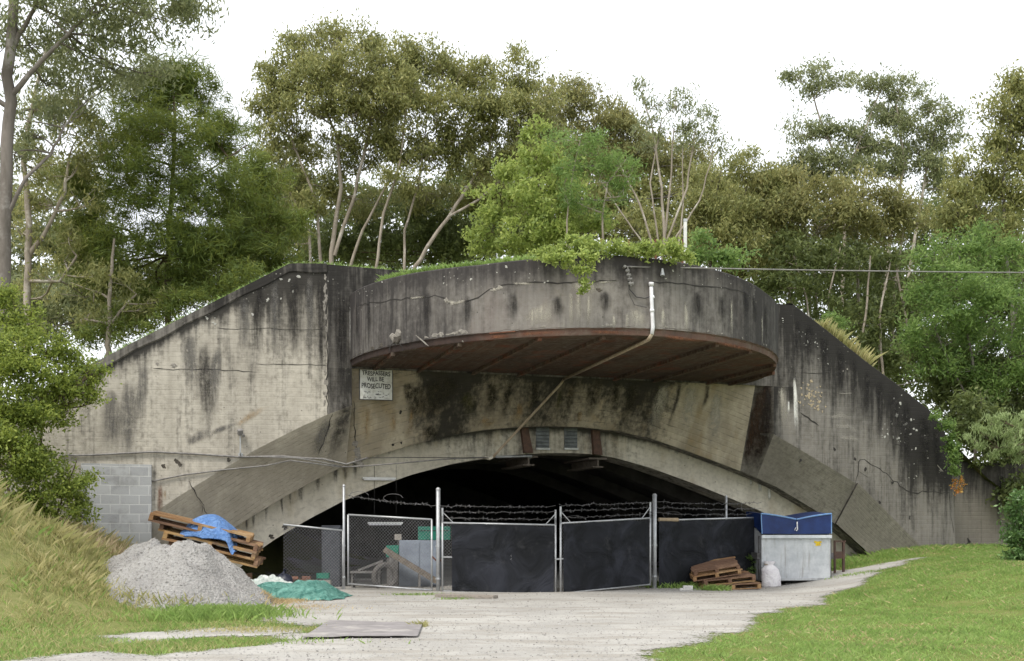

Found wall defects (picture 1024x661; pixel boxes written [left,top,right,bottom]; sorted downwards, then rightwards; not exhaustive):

crack [359,280,616,306]
crack [652,281,750,296]
water stain [105,367,145,441]
water stain [185,339,220,408]
water stain [745,380,798,456]
crack [855,459,1001,545]